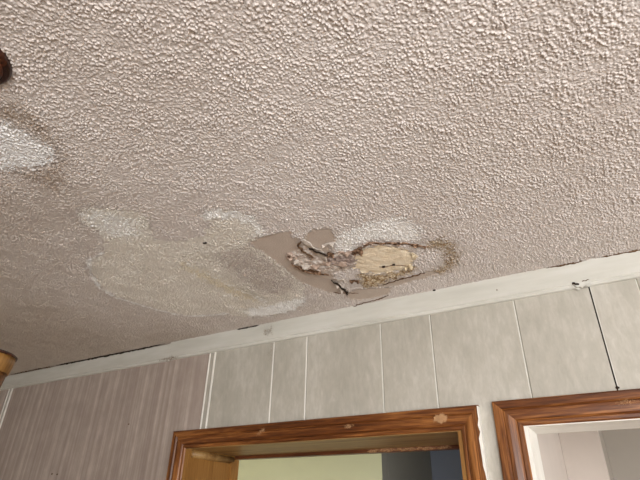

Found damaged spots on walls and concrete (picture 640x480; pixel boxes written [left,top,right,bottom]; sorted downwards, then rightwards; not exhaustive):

damp [0,96,82,193]
damp [69,200,307,319]
peeling [249,228,440,301]
crack [11,344,162,375]